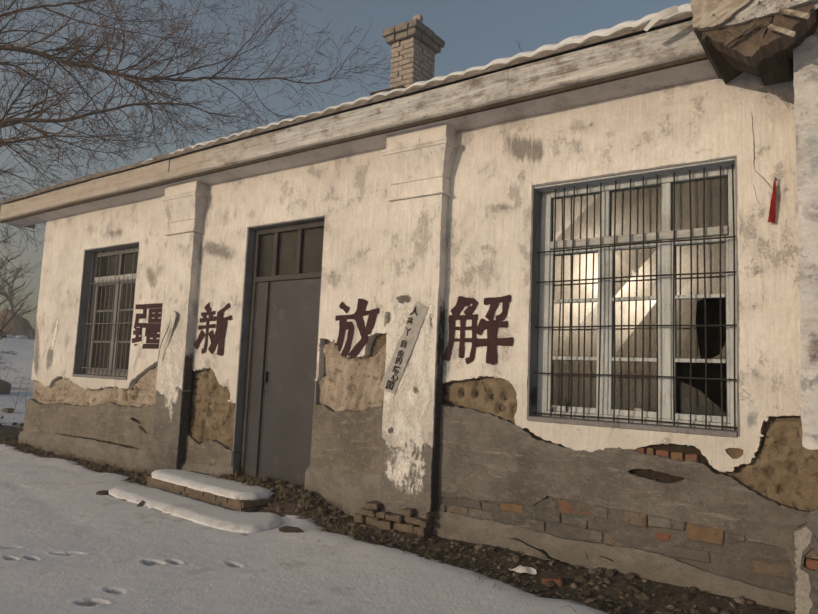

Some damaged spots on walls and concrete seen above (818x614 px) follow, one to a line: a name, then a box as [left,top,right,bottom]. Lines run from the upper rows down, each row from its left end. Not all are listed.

crack [751,113,773,203]
flaking render [32,310,182,418]
flaking render [190,367,236,450]
peeling [316,295,434,494]
flaking render [443,310,517,423]
flaking render [630,416,818,511]